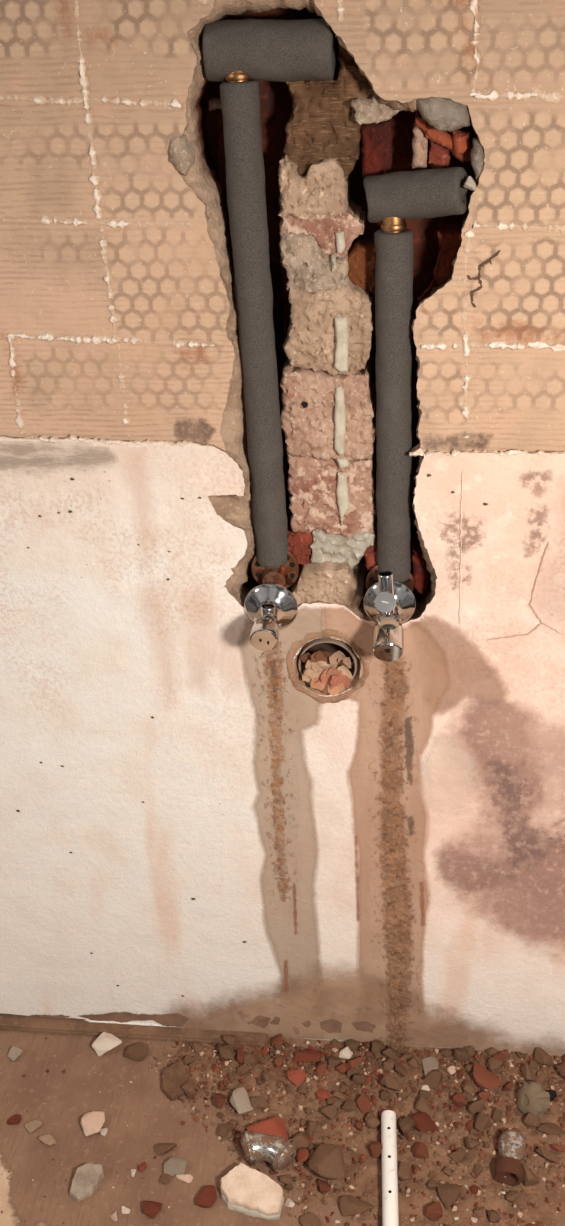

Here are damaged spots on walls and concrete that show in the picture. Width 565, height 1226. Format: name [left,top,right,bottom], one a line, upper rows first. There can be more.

spalling [178,0,485,623]
crack [489,542,564,640]
rust [258,643,297,934]
water stain [0,608,565,1226]
rust [374,660,425,1046]